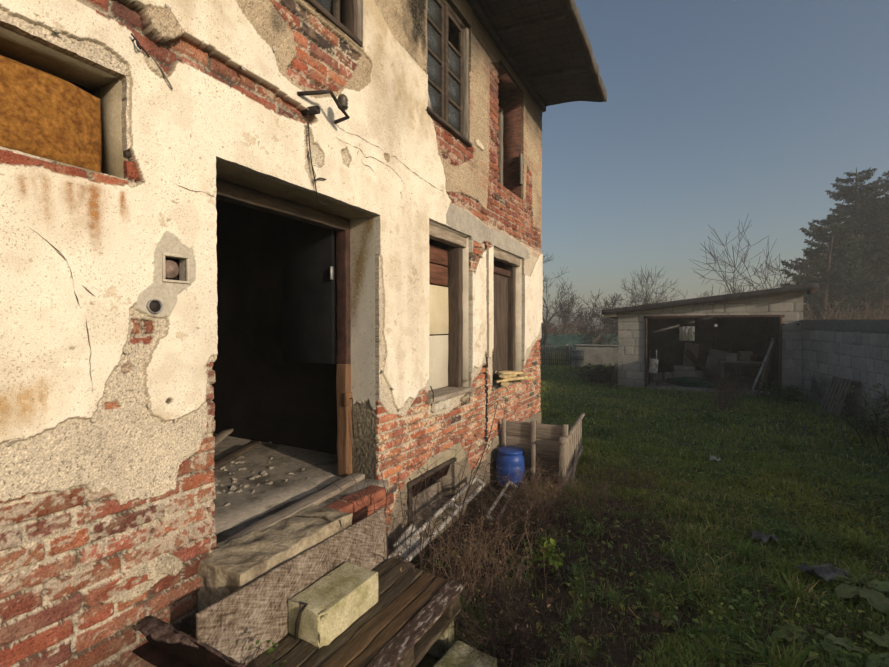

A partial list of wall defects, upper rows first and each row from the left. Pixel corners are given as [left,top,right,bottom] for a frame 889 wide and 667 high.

flaking render [0,307,217,667]